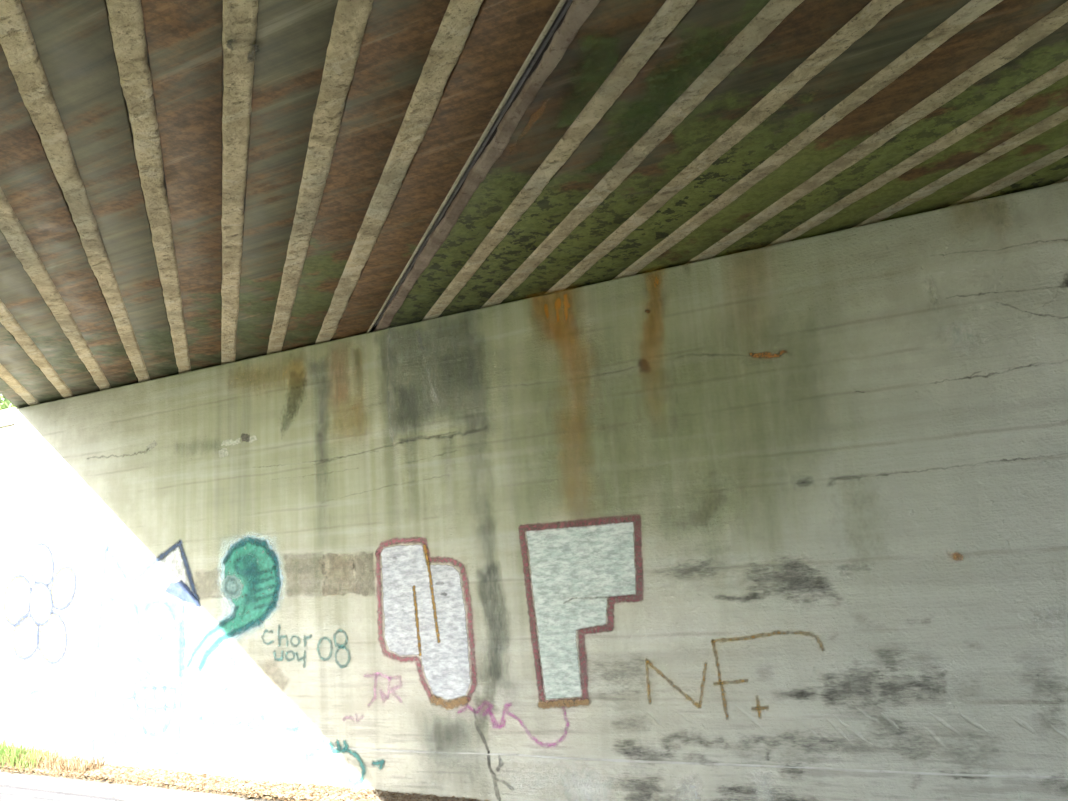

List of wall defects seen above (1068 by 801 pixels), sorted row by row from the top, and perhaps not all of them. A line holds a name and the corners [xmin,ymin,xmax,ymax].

leakage [480,570,506,678]
leakage [841,675,941,696]
crack [474,709,509,796]